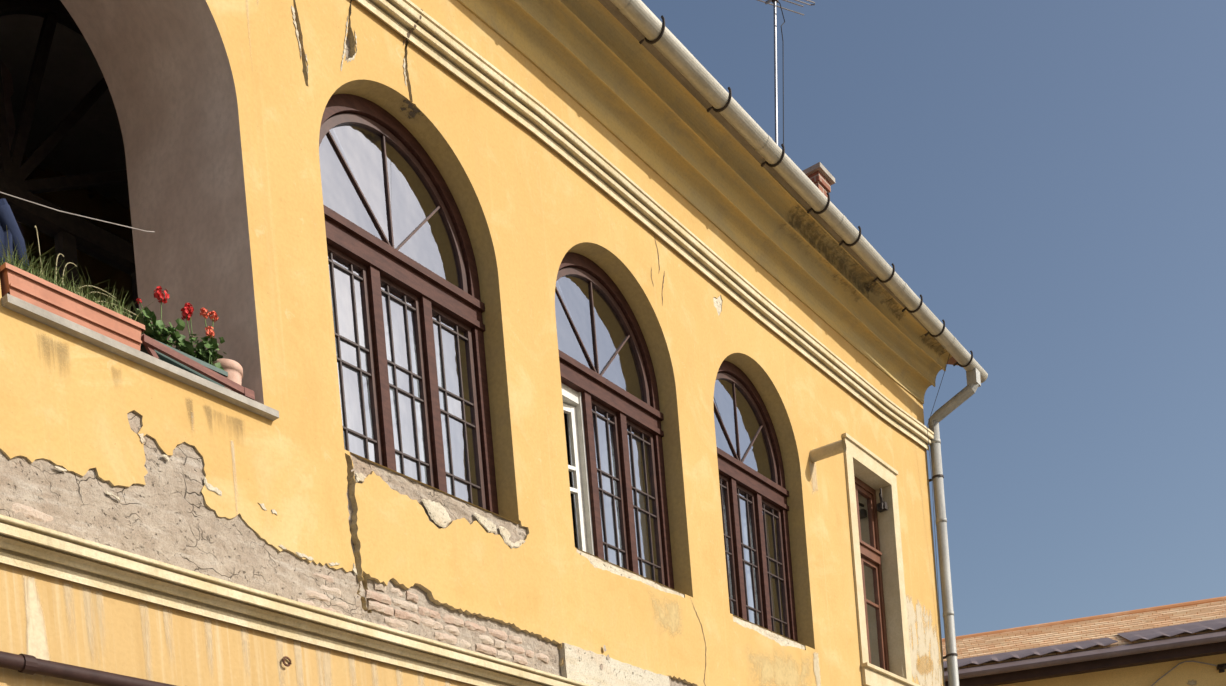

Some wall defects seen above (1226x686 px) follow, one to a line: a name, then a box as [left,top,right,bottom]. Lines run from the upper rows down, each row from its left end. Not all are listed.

crack [291,0,308,86]
crack [341,0,357,71]
crack [401,9,423,119]
peeling [0,410,563,677]
spalling [668,676,698,686]